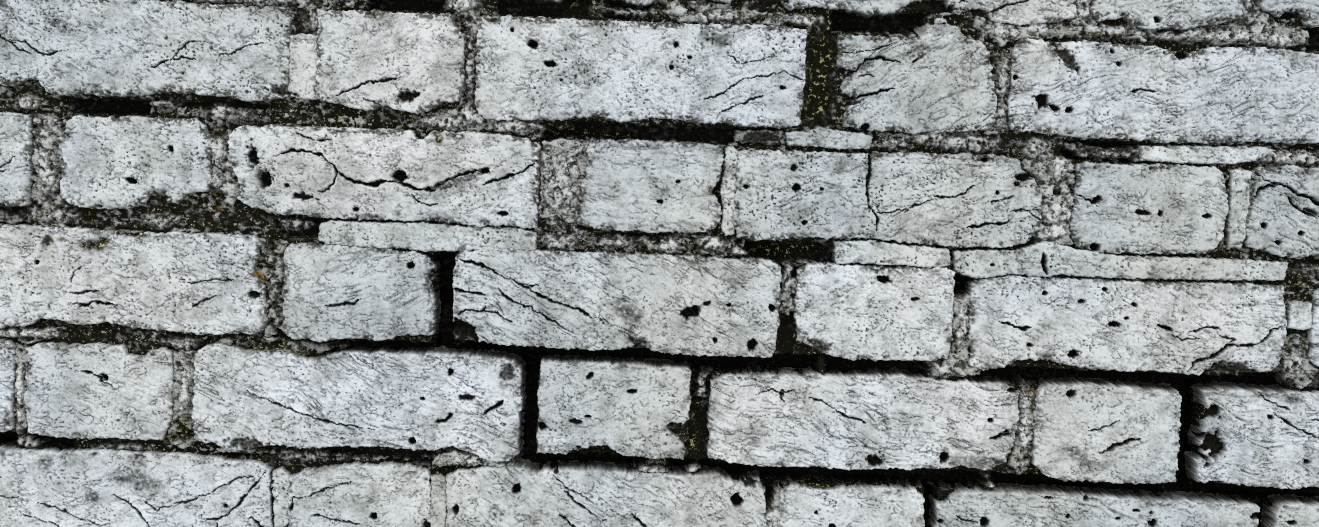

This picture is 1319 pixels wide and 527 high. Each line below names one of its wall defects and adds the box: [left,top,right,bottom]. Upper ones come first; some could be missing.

crack [865,154,1041,228]
crack [1040,253,1048,274]